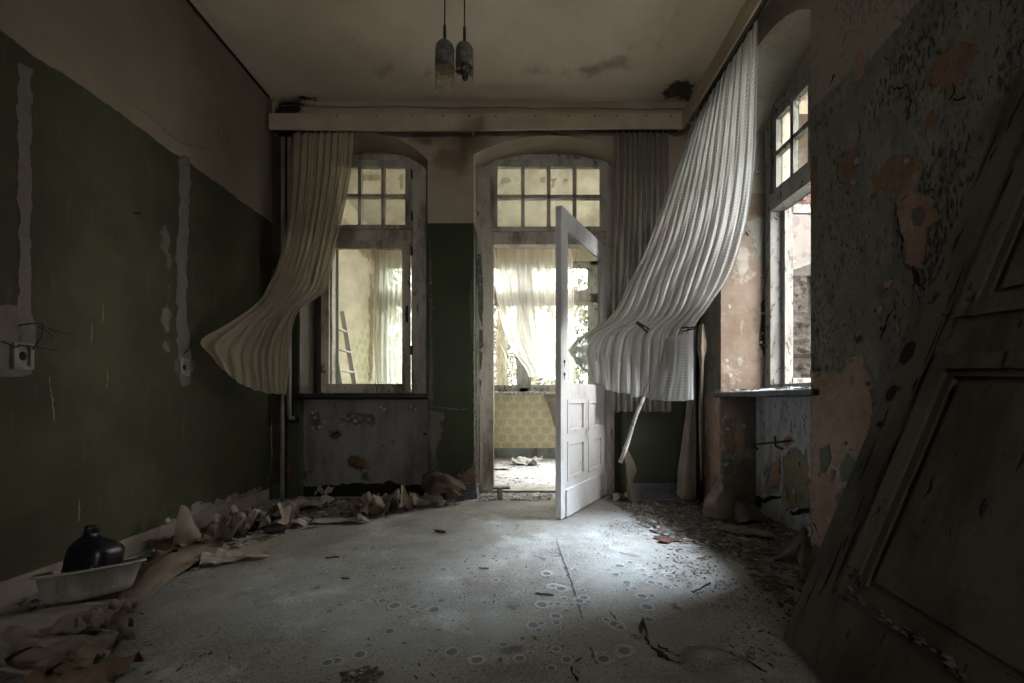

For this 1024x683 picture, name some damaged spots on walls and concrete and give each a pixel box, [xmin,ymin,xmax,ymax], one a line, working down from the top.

peeling [746,217,765,277]
spalling [890,190,943,269]
peeling [160,230,172,352]
peeling [758,300,767,358]
spalling [704,328,875,547]